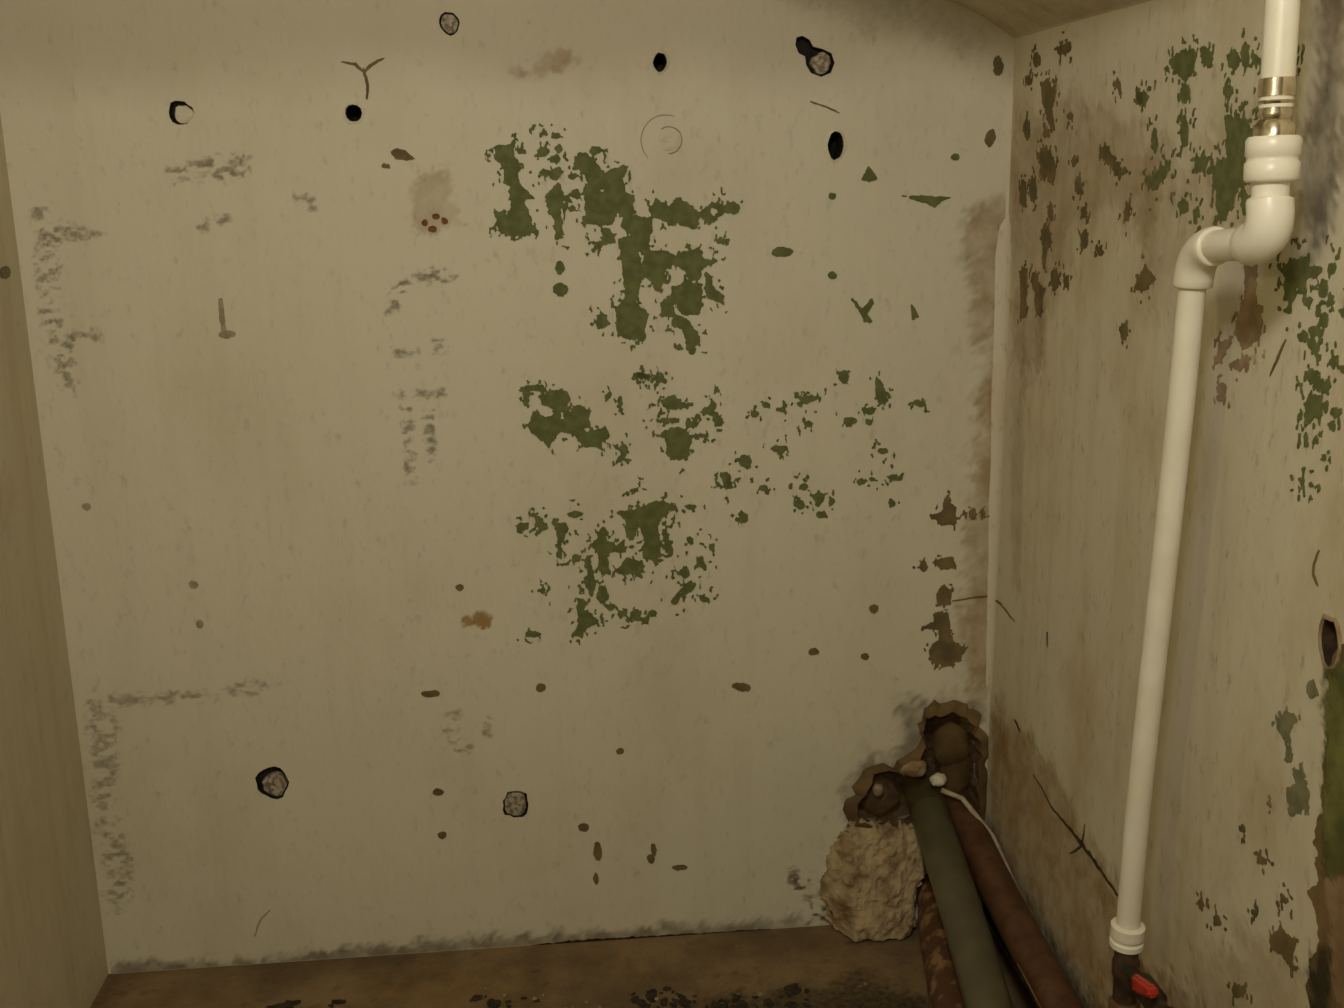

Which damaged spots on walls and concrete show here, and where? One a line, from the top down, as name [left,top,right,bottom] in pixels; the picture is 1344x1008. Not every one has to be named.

peeling [484,124,743,355]
peeling [1017,31,1107,324]
peeling [1099,28,1261,237]
peeling [515,380,719,646]
peeling [631,365,724,474]
peeling [711,369,851,525]
peeling [836,371,904,508]
peeling [912,554,968,670]
peeling [929,490,989,531]
peeling [1212,235,1344,503]
spalling [843,700,989,829]
peeling [1266,644,1344,1008]